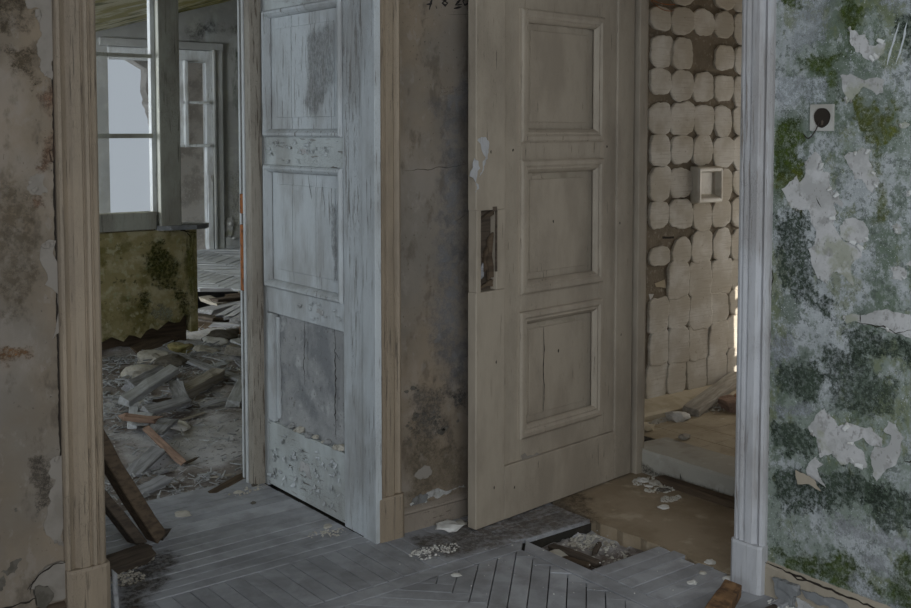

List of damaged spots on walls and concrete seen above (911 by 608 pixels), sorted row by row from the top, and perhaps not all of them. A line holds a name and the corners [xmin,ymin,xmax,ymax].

peeling [848,26,886,62]
damp [880,0,911,58]
crack [49,61,57,261]
damp [773,208,837,321]
peeling [782,152,869,286]
damp [774,0,906,222]
peeling [844,147,879,192]
crack [54,293,62,456]
damp [770,323,911,608]
peeling [795,408,903,491]
crack [4,562,65,608]
crack [765,562,875,608]